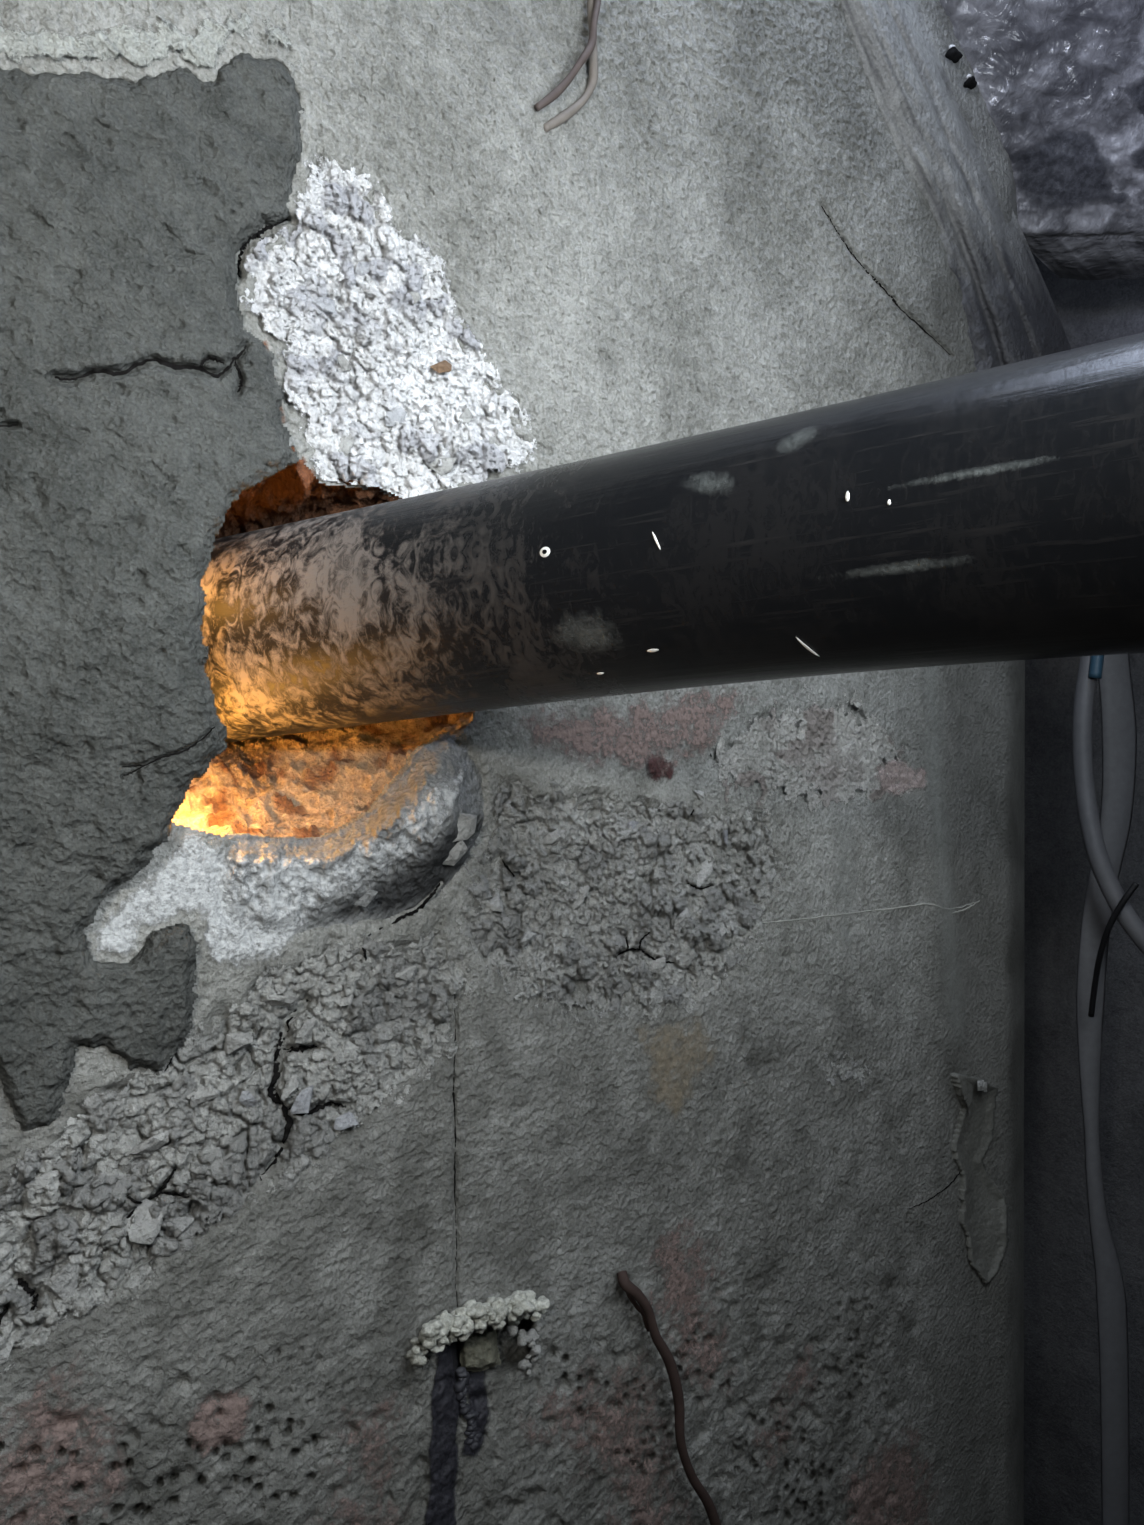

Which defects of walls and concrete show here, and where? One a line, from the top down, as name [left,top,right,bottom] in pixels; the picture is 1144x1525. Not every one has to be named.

crack [55,345,247,393]
spalling [215,154,537,539]
corrosion [291,446,314,485]
spalling [172,711,475,838]
crack [362,883,440,960]
crack [616,932,674,963]
crack [260,999,346,1181]
crack [126,1169,189,1219]
crack [451,1008,459,1307]
flaking render [909,1073,1009,1284]
crack [0,1278,39,1325]
leakage [462,1371,489,1456]